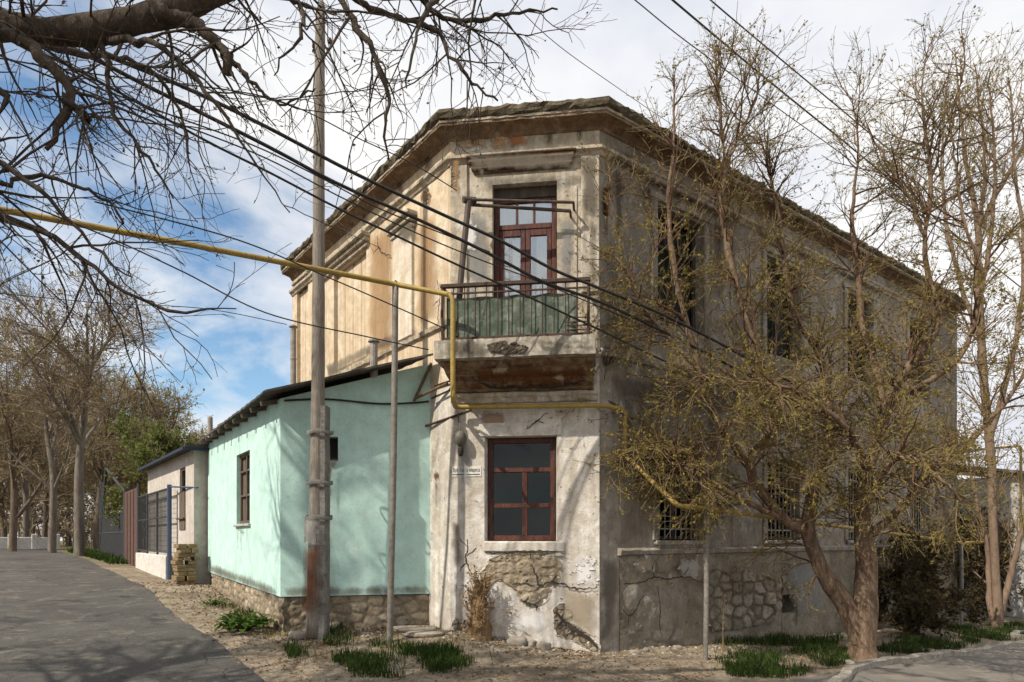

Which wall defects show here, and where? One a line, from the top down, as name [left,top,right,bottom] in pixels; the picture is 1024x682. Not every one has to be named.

crack [472,377,586,429]
crack [460,538,599,648]
spalling [478,552,601,652]
crack [623,558,703,638]
spalling [678,554,783,632]